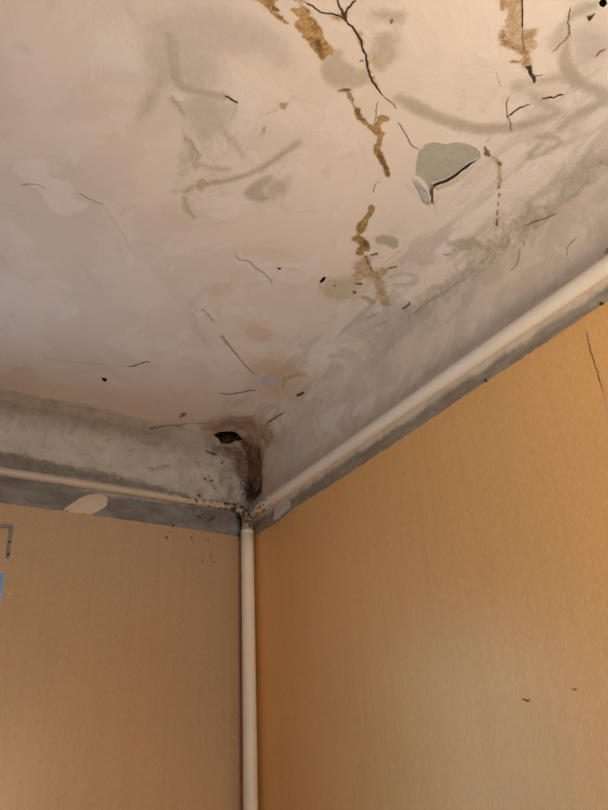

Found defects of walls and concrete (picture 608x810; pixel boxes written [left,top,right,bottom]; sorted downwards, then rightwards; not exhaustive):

crack [305,0,418,149]
crack [497,0,564,132]
crack [553,7,571,51]
crack [586,332,608,412]
leakage [0,449,188,496]
leakage [196,412,277,508]